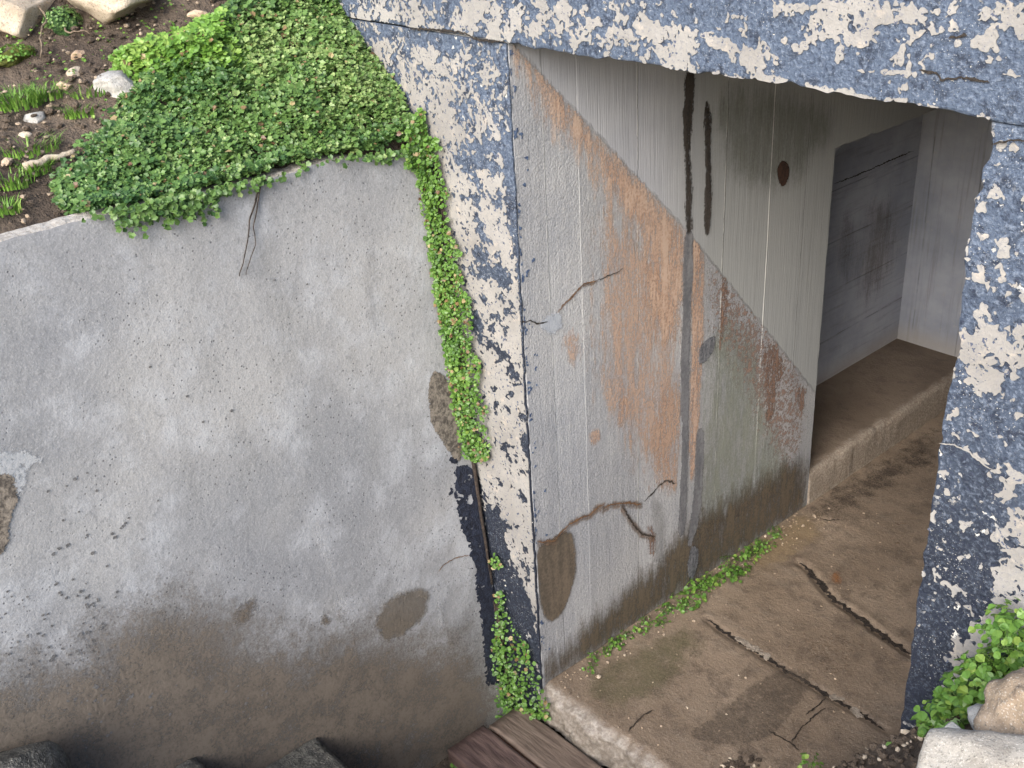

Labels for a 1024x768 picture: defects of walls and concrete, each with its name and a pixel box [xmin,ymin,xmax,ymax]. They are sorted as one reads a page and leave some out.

damp [682,72,713,235]
crack [520,268,623,325]
corrosion [515,49,808,491]
peeling [339,0,1024,688]
spalling [0,473,19,555]
damp [537,532,576,621]
crack [538,480,675,545]
damp [545,430,933,680]
crack [799,563,911,654]
damp [0,589,499,768]
crack [706,619,885,750]